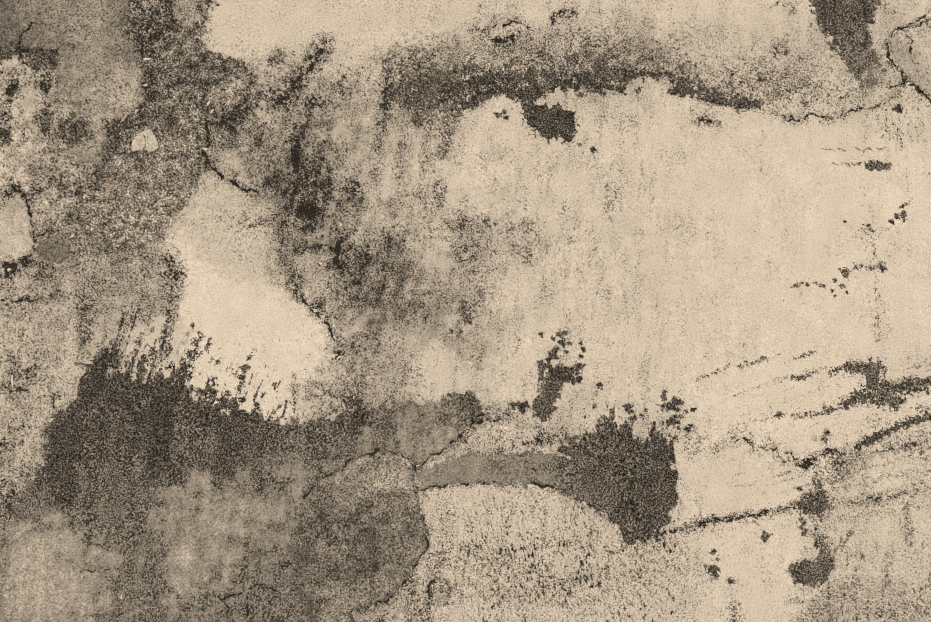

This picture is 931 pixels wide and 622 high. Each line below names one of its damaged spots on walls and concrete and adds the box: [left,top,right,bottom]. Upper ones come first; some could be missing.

leakage [40,102,93,149]
leakage [380,28,773,165]
crack [700,15,931,122]
leakage [808,0,903,113]
crack [13,190,35,241]
leakage [760,402,846,422]
leakage [825,356,888,398]
leakage [0,323,697,622]
crack [293,410,617,620]
crack [635,500,803,540]
leakage [708,549,734,584]
leakage [780,472,854,588]